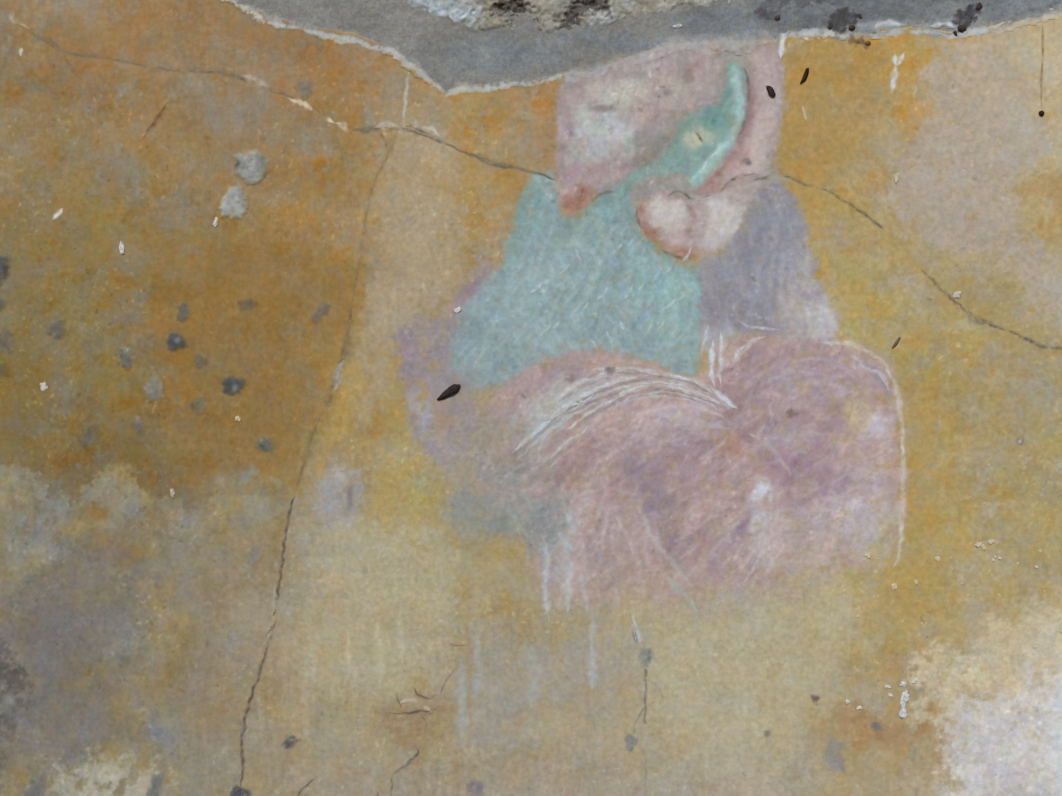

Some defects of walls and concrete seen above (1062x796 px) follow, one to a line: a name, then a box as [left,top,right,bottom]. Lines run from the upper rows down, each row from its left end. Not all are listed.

crack [666,171,1062,352]
crack [0,5,557,796]
water stain [628,572,1062,796]